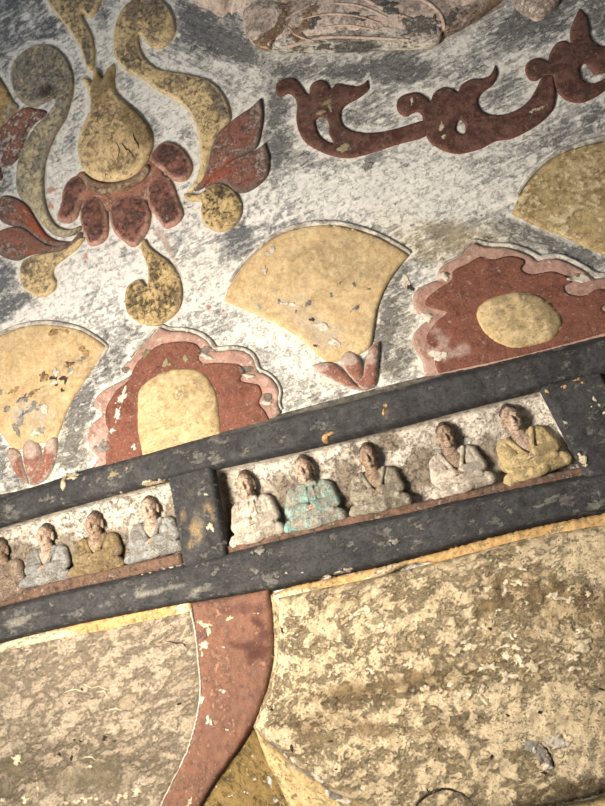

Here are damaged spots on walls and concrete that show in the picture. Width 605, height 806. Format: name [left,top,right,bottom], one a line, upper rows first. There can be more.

peeling [0,346,89,438]
peeling [93,385,127,454]
crack [416,787,474,806]